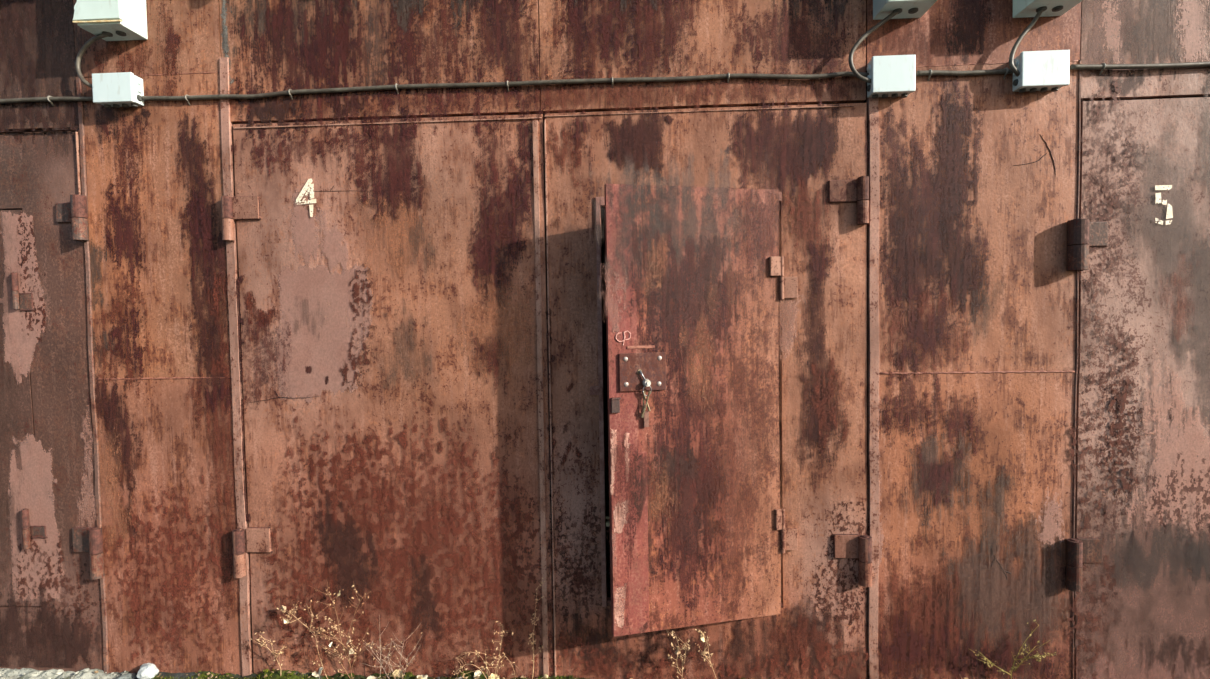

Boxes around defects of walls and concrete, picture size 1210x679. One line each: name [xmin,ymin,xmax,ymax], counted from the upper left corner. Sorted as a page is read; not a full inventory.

corrosion [86,0,182,95]
peeling [0,211,48,384]
corrosion [88,101,1073,679]
peeling [8,433,106,630]